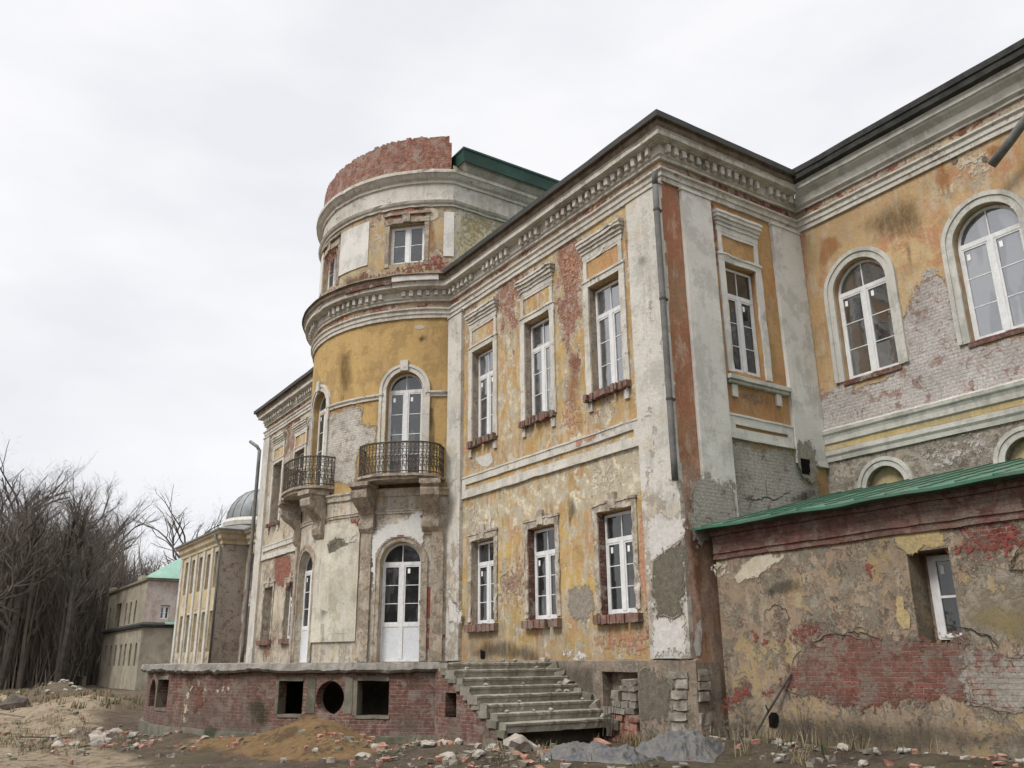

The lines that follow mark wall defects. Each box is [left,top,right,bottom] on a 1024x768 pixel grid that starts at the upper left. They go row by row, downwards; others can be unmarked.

flaking render [820,268,1024,430]
flaking render [321,401,378,485]
flaking render [268,527,291,589]
spalling [590,439,824,727]
peeling [892,523,1024,558]
crack [820,627,880,654]
flaking render [719,596,1024,717]
crack [957,627,998,651]